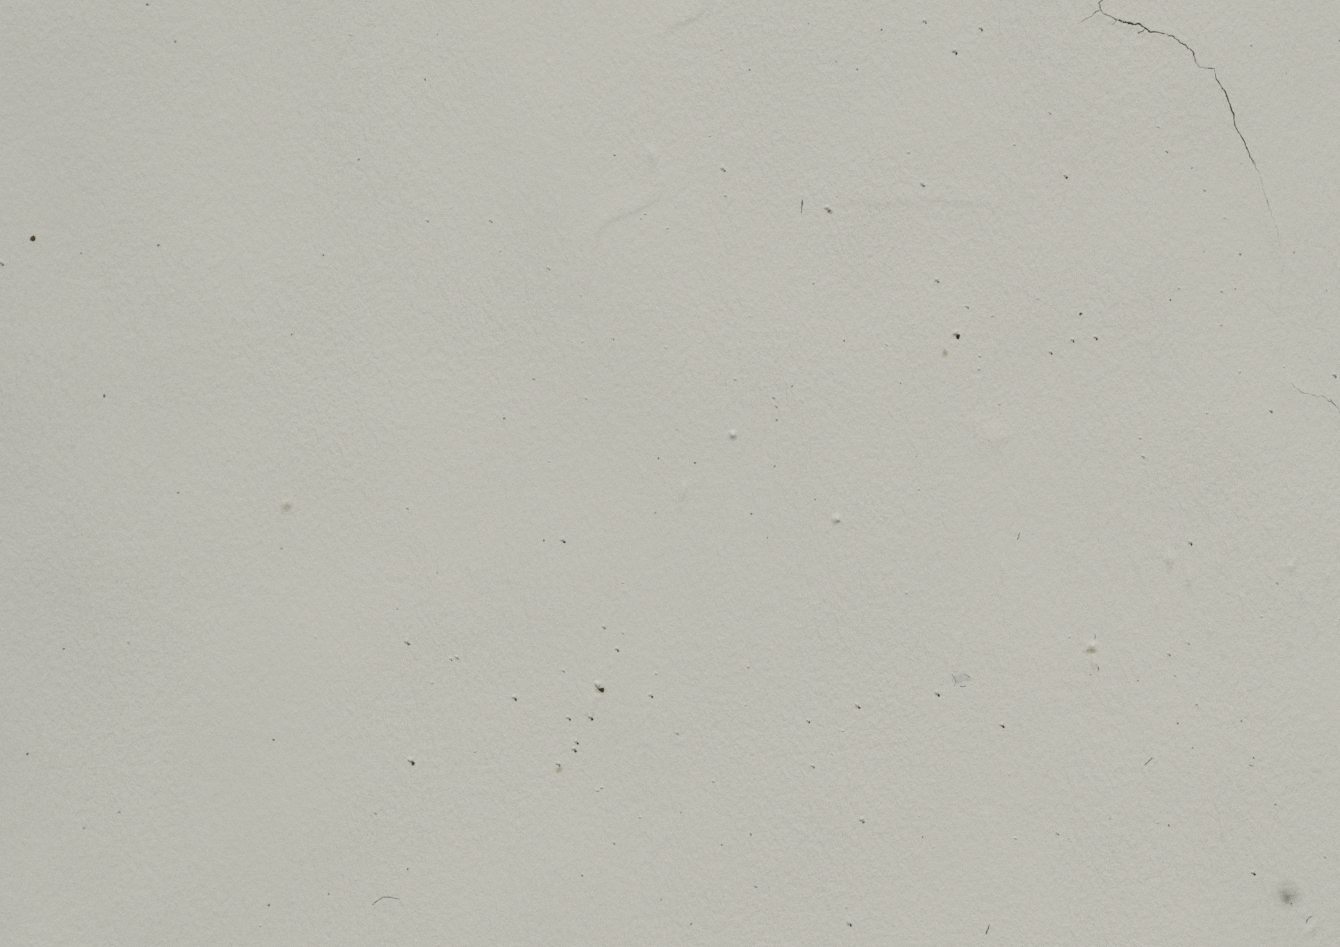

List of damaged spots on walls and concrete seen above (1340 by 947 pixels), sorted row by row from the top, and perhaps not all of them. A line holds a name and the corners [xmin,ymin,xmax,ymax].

crack [1080,0,1279,240]